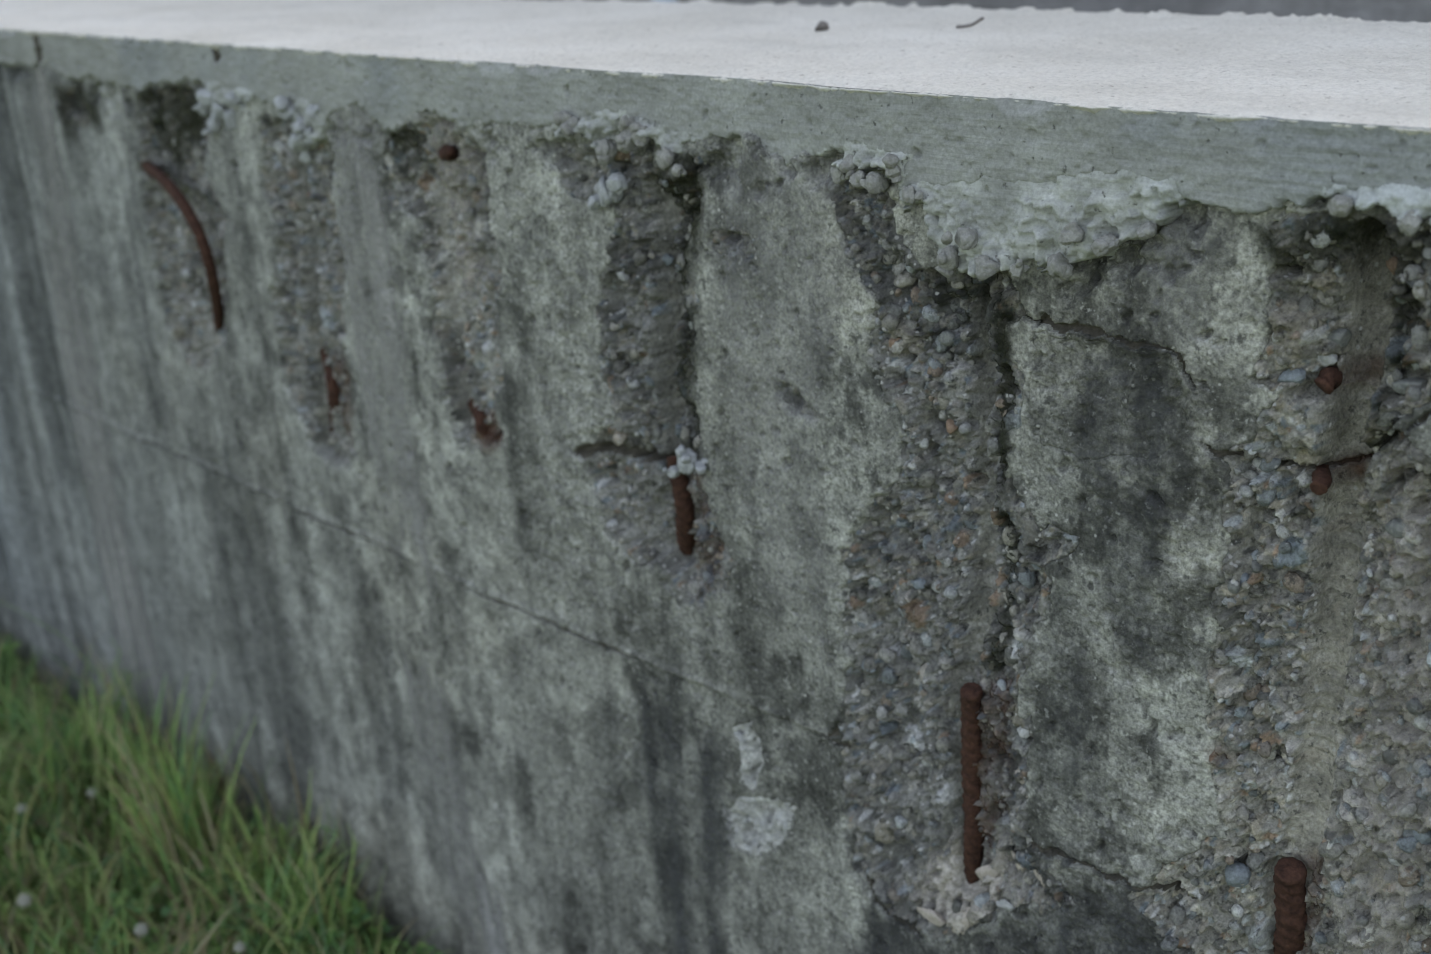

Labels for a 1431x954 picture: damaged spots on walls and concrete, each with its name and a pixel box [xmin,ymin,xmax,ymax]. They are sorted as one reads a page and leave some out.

spalling [137,84,229,371]
spalling [259,113,356,467]
spalling [383,116,504,446]
crack [479,593,632,657]
crack [575,439,676,464]
spalling [553,140,735,610]
crack [828,725,852,749]
spalling [825,175,1188,938]
crack [1030,312,1196,386]
crack [1206,444,1244,457]
spalling [1127,211,1431,954]
crack [1280,411,1429,470]